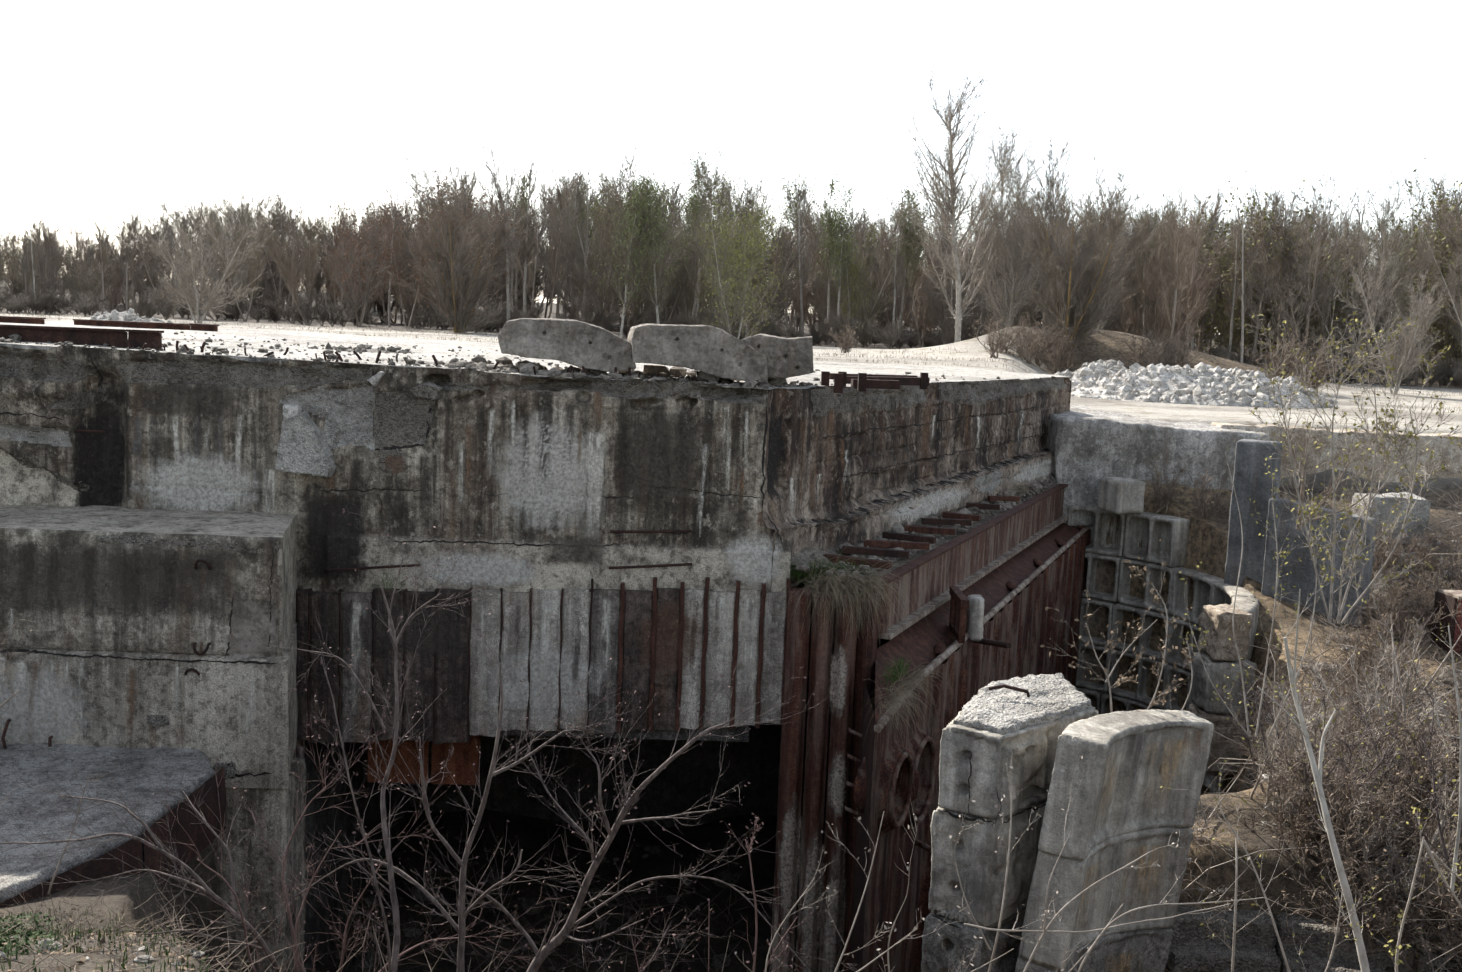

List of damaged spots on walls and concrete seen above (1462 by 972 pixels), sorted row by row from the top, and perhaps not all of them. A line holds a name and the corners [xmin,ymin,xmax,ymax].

crack [0,412,63,420]
spalling [0,423,90,492]
spalling [0,349,97,385]
spalling [123,339,216,353]
damp [300,461,366,584]
spalling [315,350,408,364]
spalling [279,355,764,451]
damp [460,402,605,564]
damp [411,554,535,586]
damp [320,603,457,693]
damp [0,657,82,745]
corrosion [0,767,227,908]